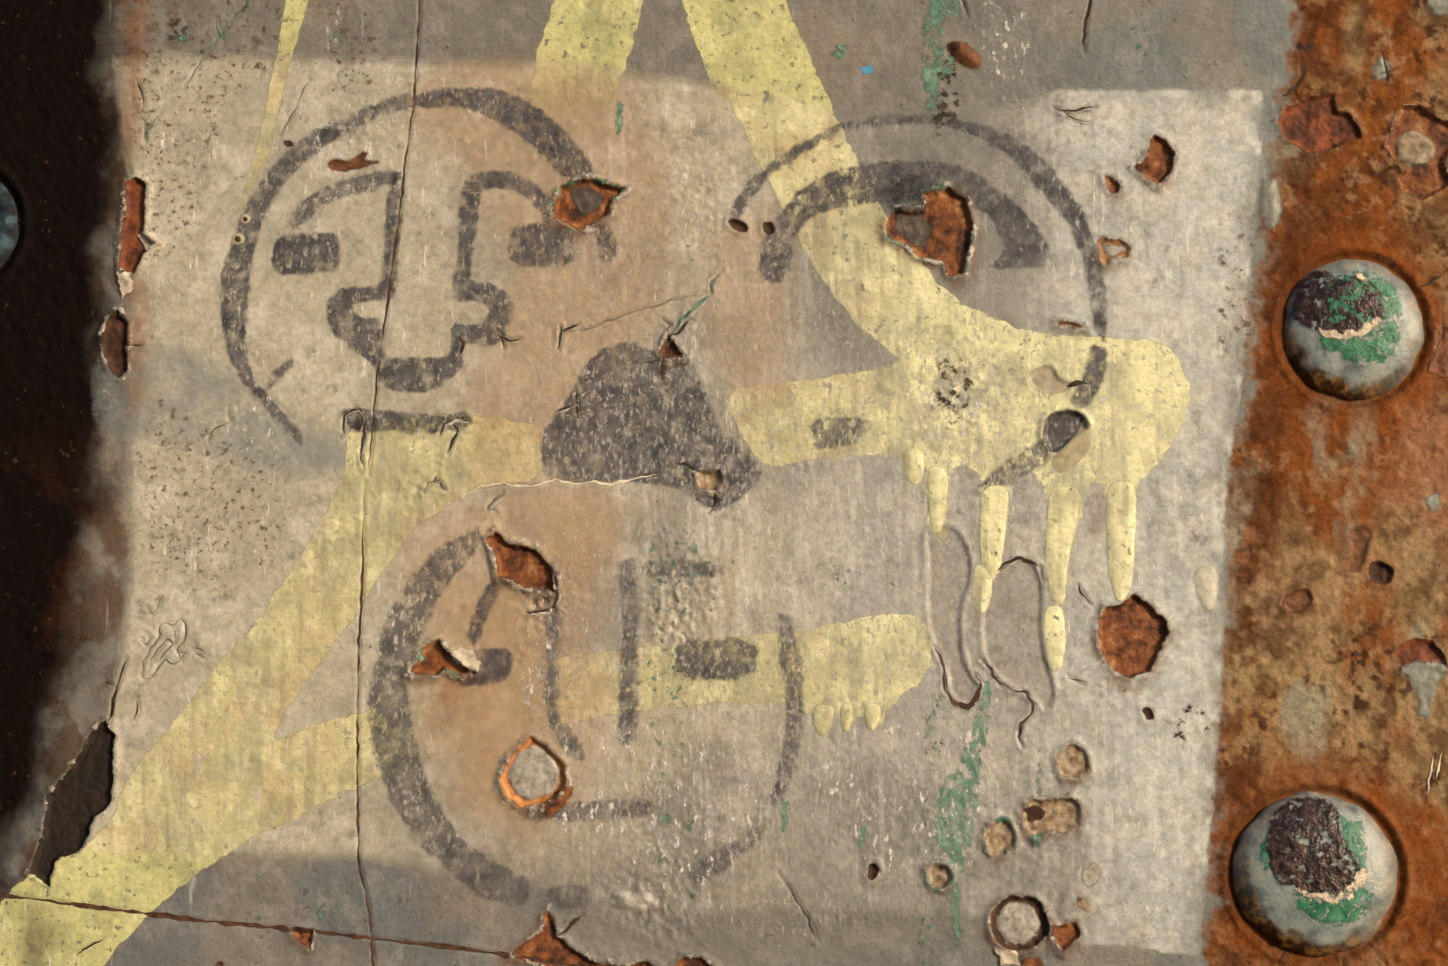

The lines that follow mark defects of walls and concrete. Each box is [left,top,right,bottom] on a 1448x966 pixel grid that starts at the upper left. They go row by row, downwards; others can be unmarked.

crack [1055,104,1097,125]
peeling [1104,135,1178,195]
peeling [98,173,164,381]
crack [557,270,723,352]
corrosion [1292,270,1385,335]
crack [0,0,580,966]
crack [989,556,1093,606]
peeling [1095,592,1171,679]
crack [934,646,1036,748]
peeling [24,659,127,890]
corrosion [1266,797,1361,895]
peeling [987,895,1082,966]